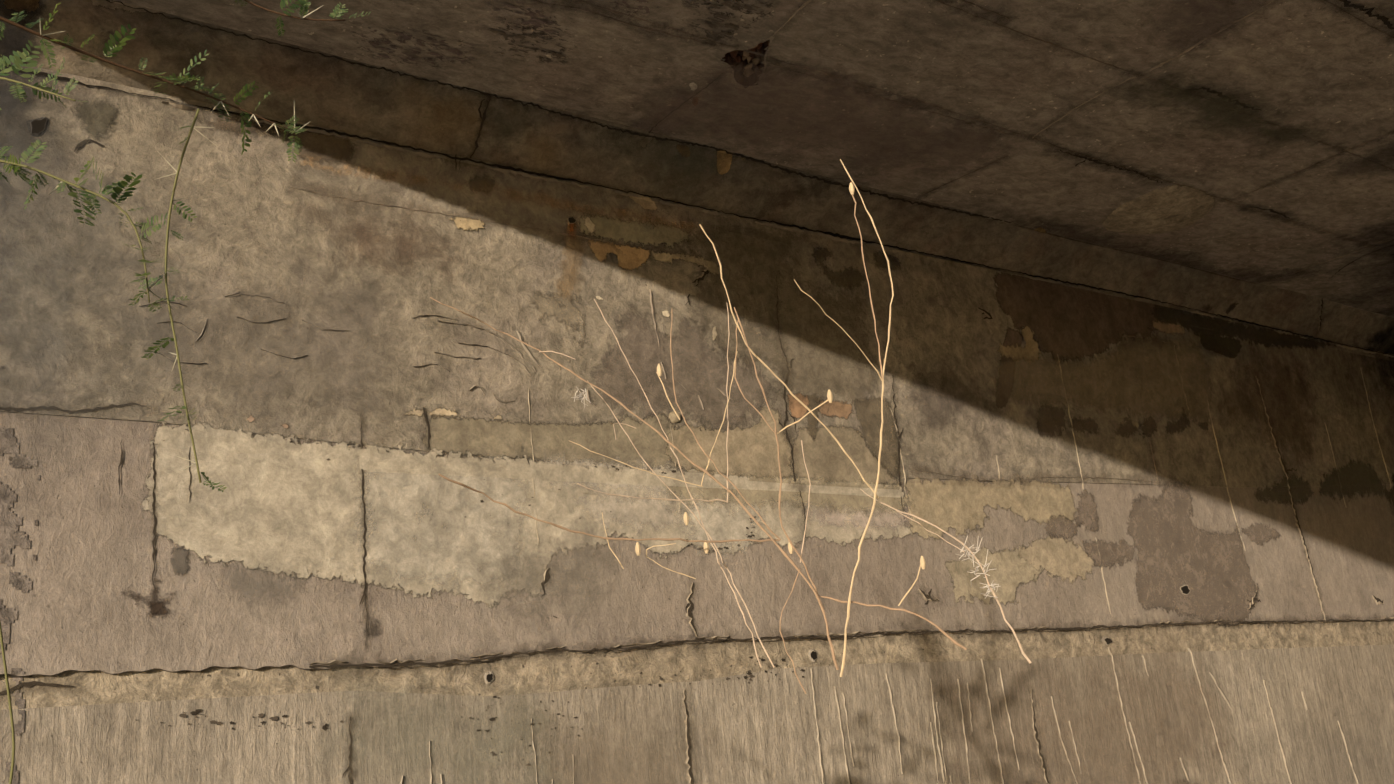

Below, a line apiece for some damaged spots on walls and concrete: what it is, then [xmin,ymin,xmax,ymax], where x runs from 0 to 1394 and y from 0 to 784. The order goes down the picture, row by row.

peeling [579,194,720,275]
leakage [912,272,1335,427]
spalling [0,481,38,593]
spalling [0,427,40,480]
peeling [142,393,1094,608]
crack [776,276,806,538]
crack [309,376,1394,668]
leakage [1037,406,1098,437]
leakage [1116,413,1208,437]
spalling [0,599,17,653]
crack [682,689,694,784]
crack [1031,689,1050,784]